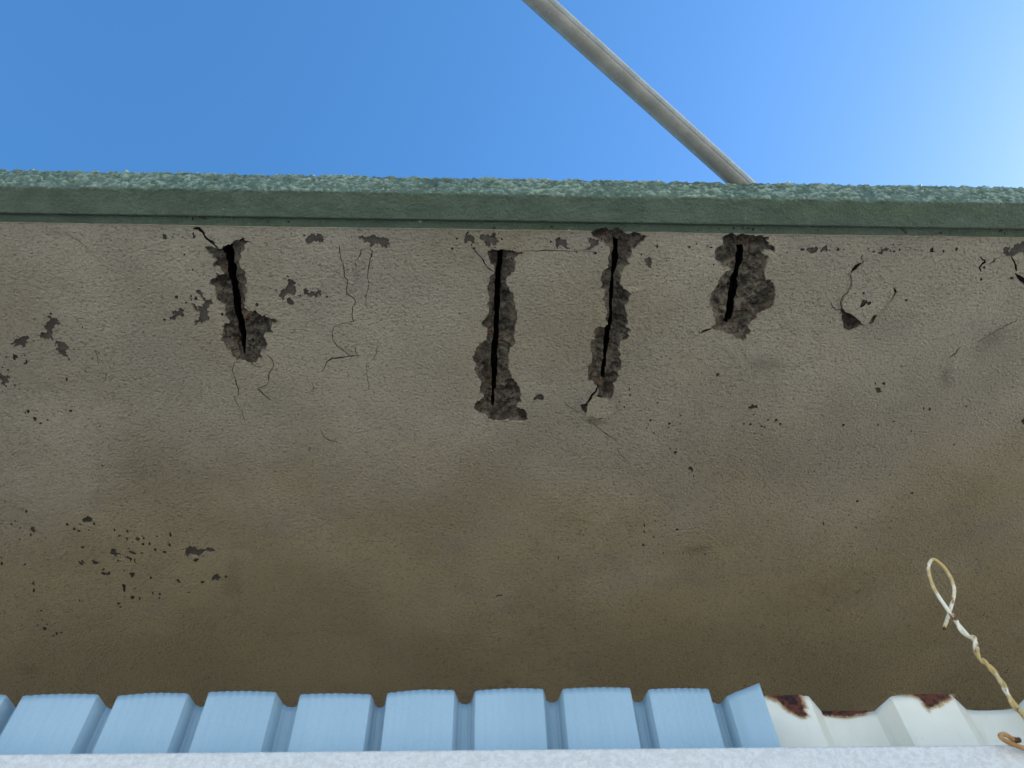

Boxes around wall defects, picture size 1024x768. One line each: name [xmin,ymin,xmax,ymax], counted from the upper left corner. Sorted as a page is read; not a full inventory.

peeling [0,312,75,392]
crack [193,227,218,248]
spalling [163,237,280,365]
crack [232,355,274,420]
crack [312,246,379,390]
spalling [451,227,544,422]
spalling [542,226,667,408]
spalling [687,226,845,342]
rust [766,695,808,718]
rust [903,694,953,711]